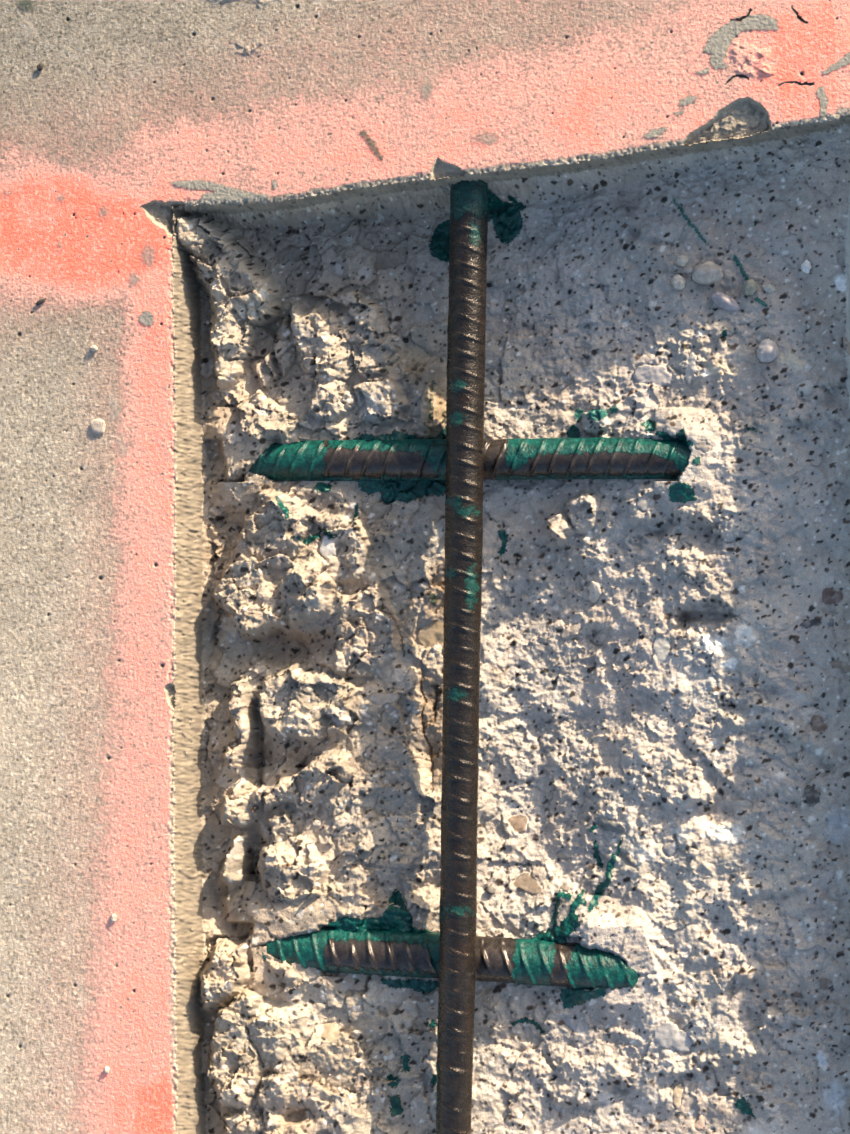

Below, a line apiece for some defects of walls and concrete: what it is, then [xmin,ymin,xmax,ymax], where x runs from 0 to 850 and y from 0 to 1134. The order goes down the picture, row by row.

spalling [139,52,850,1134]